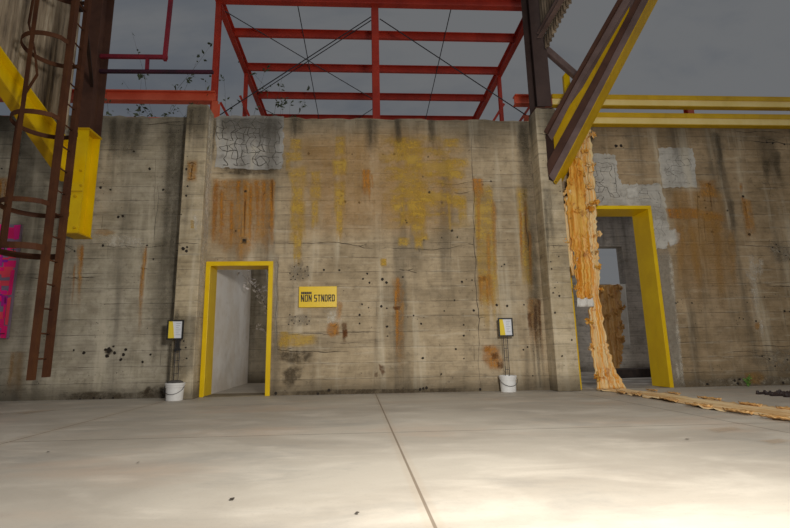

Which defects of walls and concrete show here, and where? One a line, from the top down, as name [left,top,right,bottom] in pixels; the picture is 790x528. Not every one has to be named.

crack [274,173,485,378]